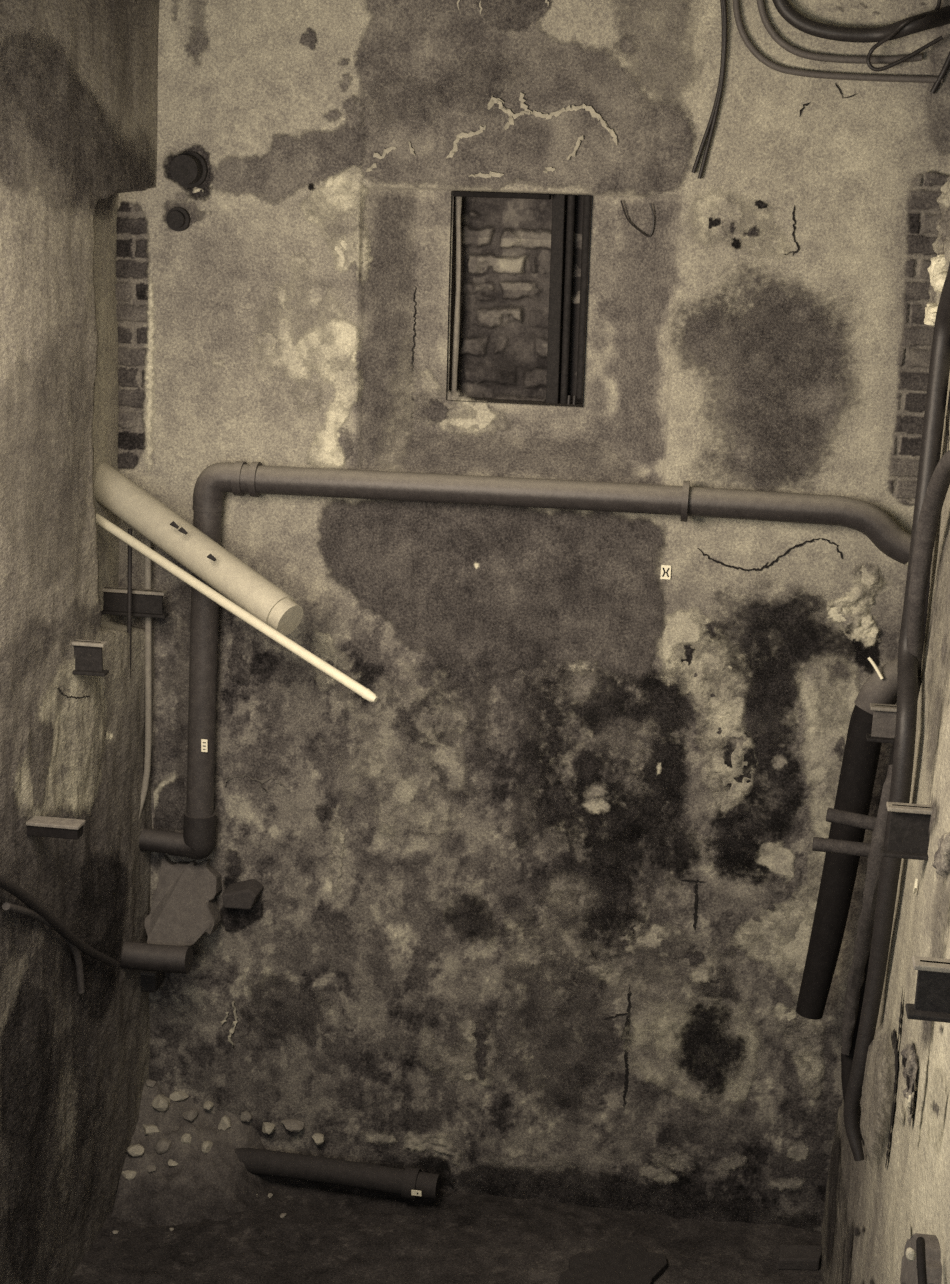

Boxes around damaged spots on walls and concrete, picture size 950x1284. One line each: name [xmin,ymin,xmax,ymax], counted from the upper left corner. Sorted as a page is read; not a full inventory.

water stain [0,34,156,217]
water stain [211,100,366,203]
flaking render [925,24,950,154]
water stain [0,351,90,585]
water stain [672,268,857,492]
flaking render [888,171,950,505]
water stain [317,499,880,1111]
water stain [930,874,950,958]
water stain [924,1068,947,1146]
water stain [458,1121,853,1284]